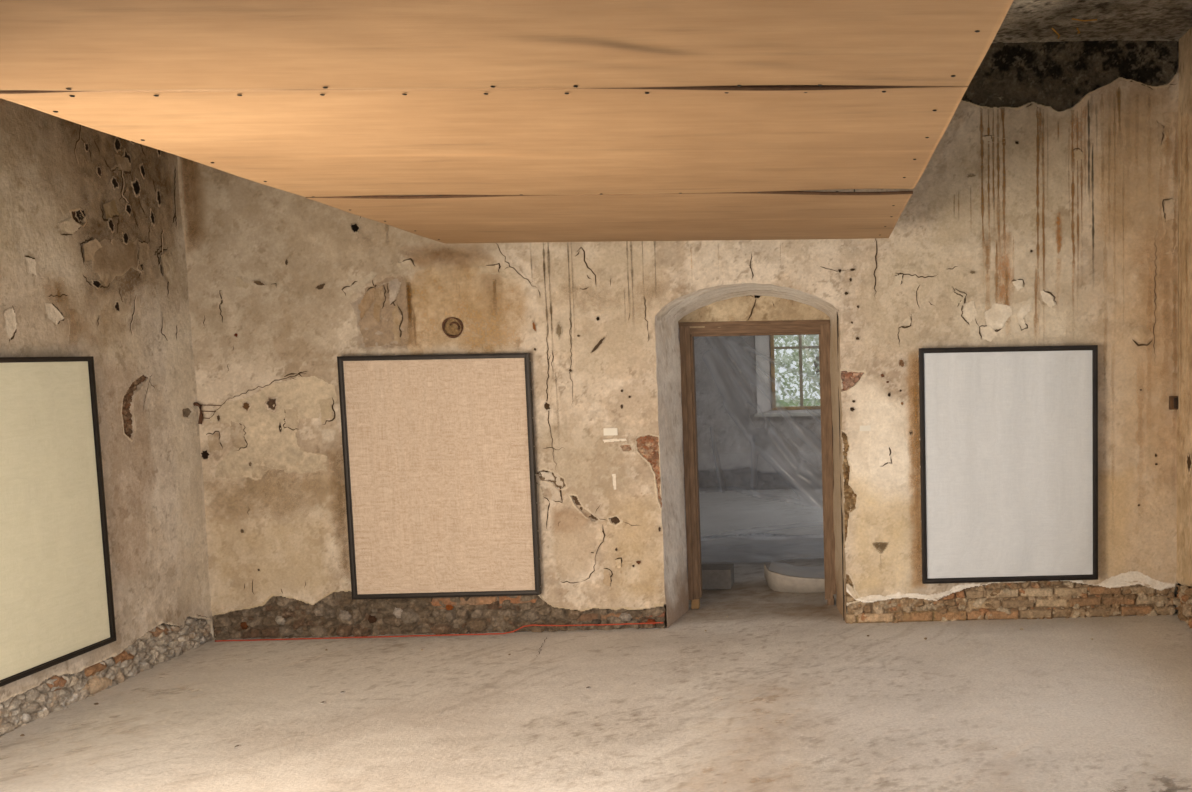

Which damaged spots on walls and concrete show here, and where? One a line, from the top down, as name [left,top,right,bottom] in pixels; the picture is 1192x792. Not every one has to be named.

spalling [960,40,1178,114]
rust [954,108,1011,306]
rust [1034,111,1086,324]
crack [628,296,652,341]
flaking render [950,279,1068,342]
crack [497,243,611,471]
spalling [618,432,662,511]
crack [544,497,553,529]
crack [562,507,641,583]
flaking render [597,547,642,587]
spalling [845,571,1192,628]
spalling [0,586,666,737]